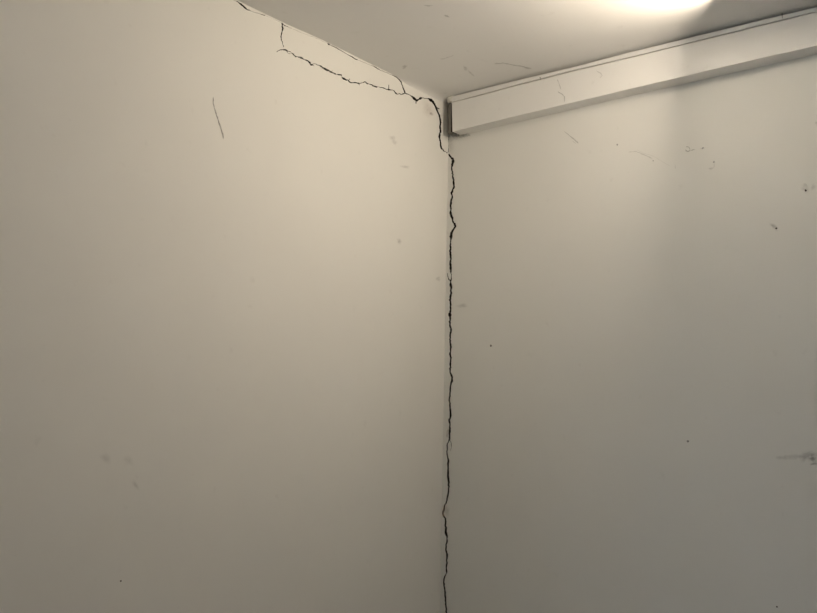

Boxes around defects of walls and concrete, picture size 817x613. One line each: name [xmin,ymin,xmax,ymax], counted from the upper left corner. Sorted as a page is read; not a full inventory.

crack [236,1,456,613]